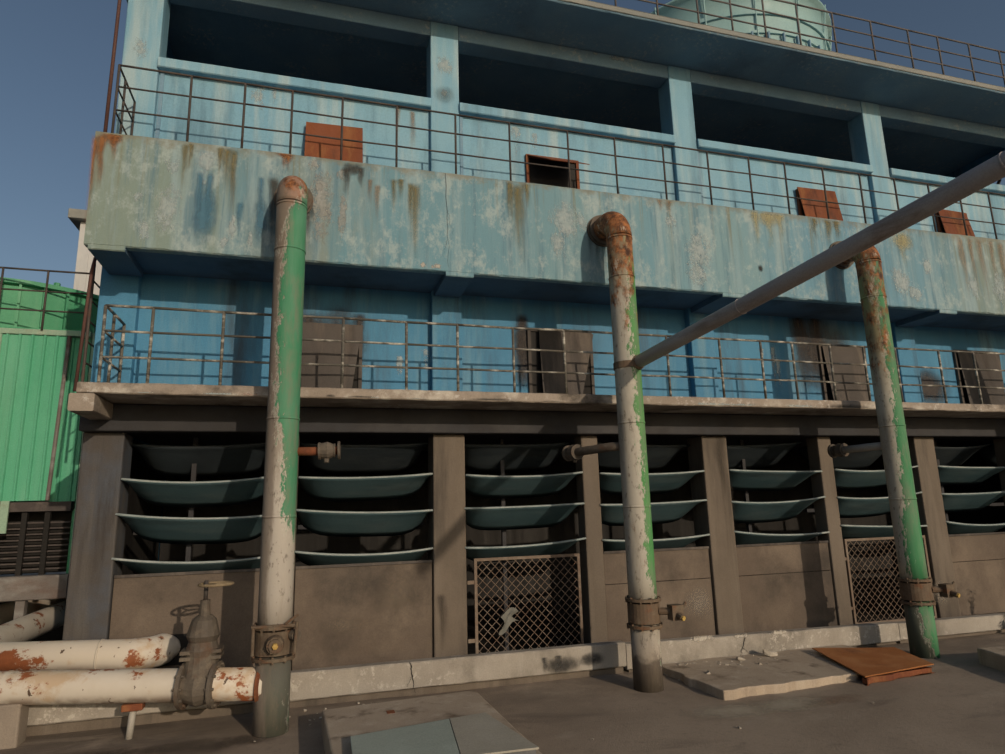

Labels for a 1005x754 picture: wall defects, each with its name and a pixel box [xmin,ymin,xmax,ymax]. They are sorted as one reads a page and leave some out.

corrosion [91,134,121,179]
damp [195,174,214,231]